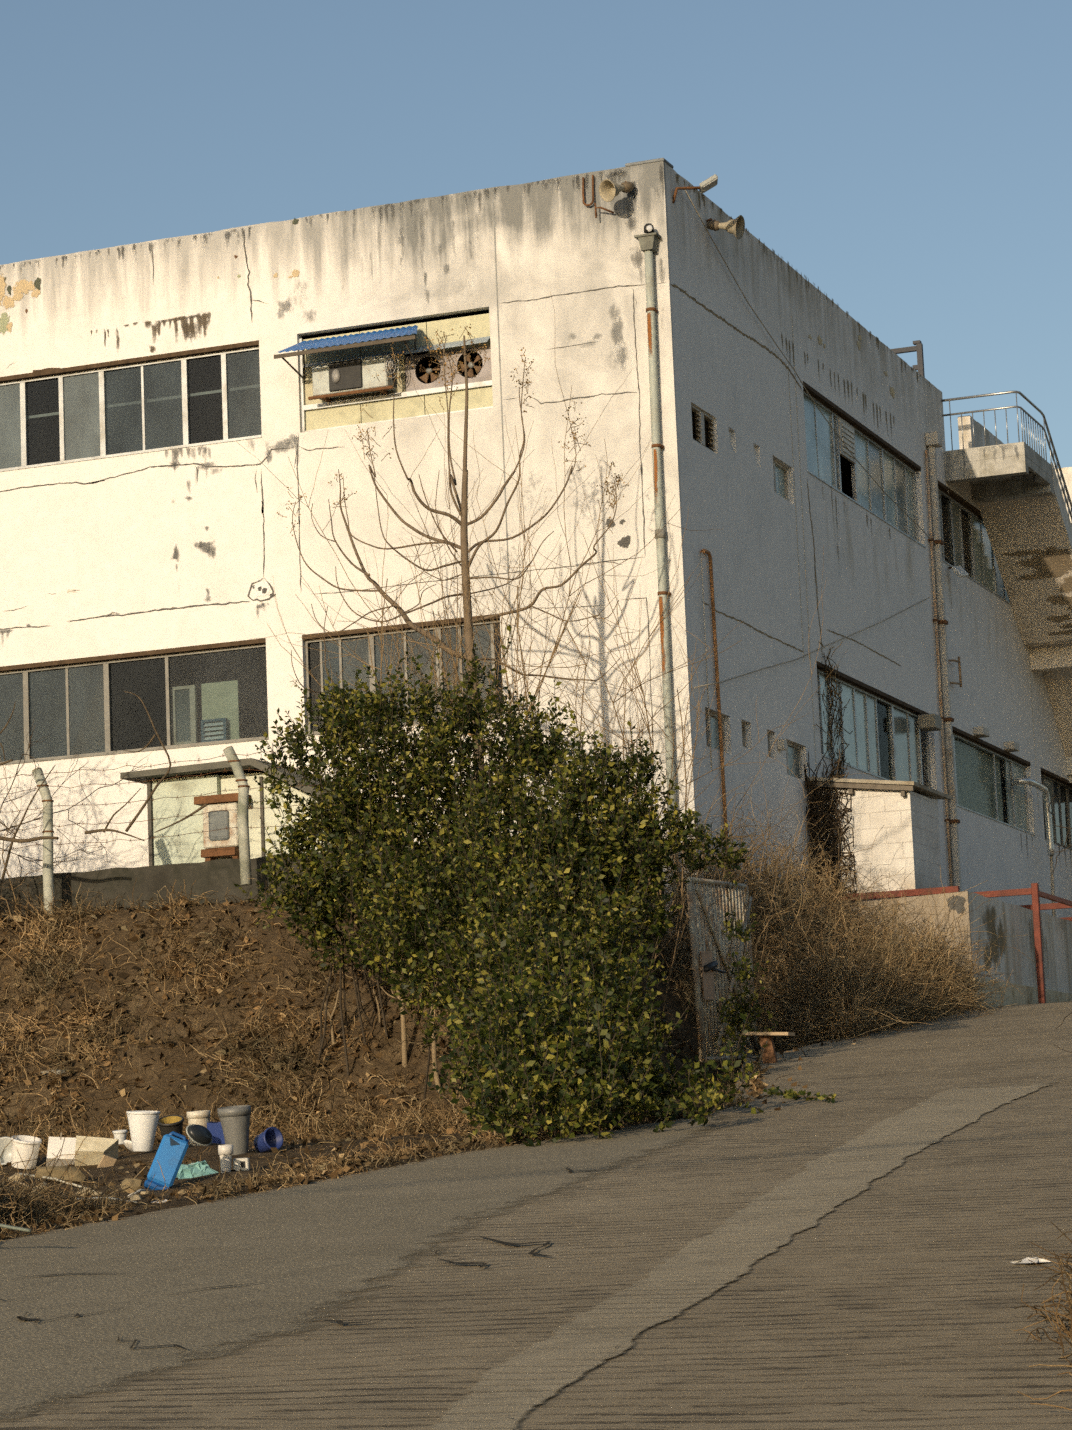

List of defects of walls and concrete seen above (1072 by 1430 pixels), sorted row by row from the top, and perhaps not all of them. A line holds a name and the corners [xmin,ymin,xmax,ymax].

peeling [0,274,41,334]
crack [0,282,801,630]
crack [551,597,653,722]